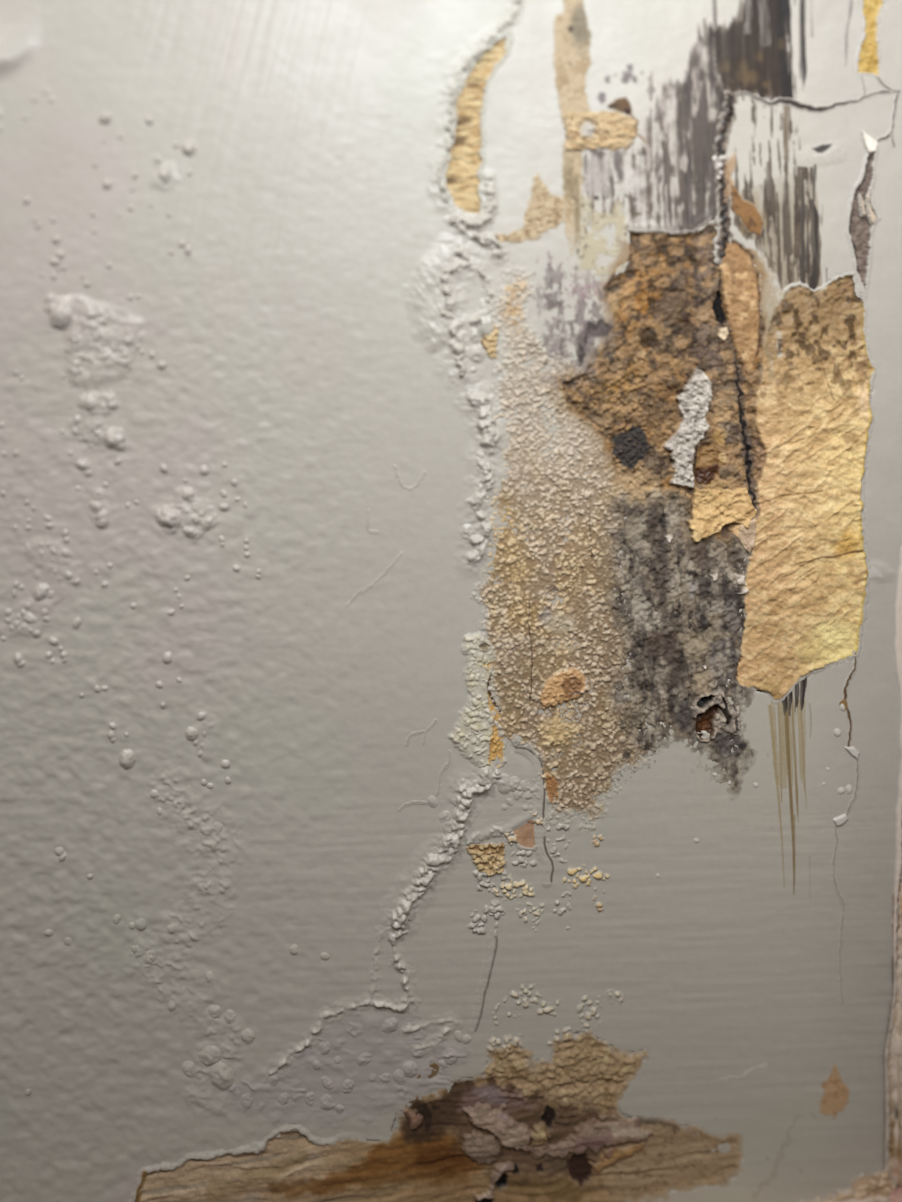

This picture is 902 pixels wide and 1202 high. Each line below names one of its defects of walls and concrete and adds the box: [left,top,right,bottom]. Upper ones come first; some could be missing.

peeling [854,0,886,77]
peeling [445,28,514,218]
flaking render [562,110,647,152]
peeling [480,325,499,360]
spalling [712,292,728,323]
damp [466,0,865,938]
peeling [661,367,727,489]
peeling [446,631,507,771]
peeling [730,129,902,1202]
peeling [466,811,547,877]
crack [884,880,902,1187]
peeling [127,1062,744,1202]